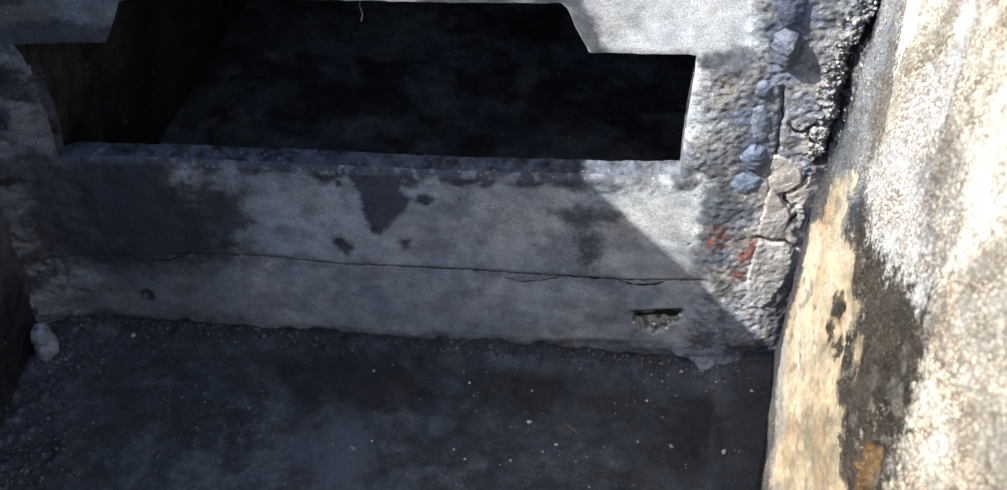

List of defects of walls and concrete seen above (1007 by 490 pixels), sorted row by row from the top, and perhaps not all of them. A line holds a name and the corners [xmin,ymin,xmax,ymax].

water stain [954,1,976,43]
water stain [335,167,433,235]
crack [129,252,708,286]
water stain [560,205,623,265]
rust [731,237,757,282]
water stain [825,0,967,490]
spalling [632,308,681,333]